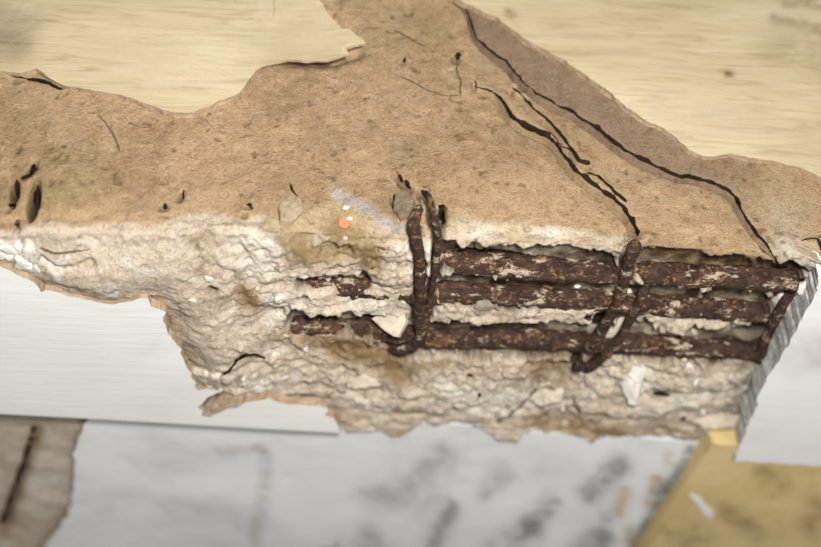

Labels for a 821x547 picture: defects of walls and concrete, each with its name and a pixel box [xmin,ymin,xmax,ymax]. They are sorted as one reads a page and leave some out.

peeling [233,0,366,95]
crack [401,9,805,282]
spalling [278,195,304,227]
spalling [420,199,435,287]
crack [801,235,821,250]
spalling [372,314,408,337]
spalling [429,289,605,333]
spalling [629,285,786,341]
spalling [202,393,248,417]
crack [222,353,266,376]
spalling [620,364,647,406]
spalling [0,414,85,547]